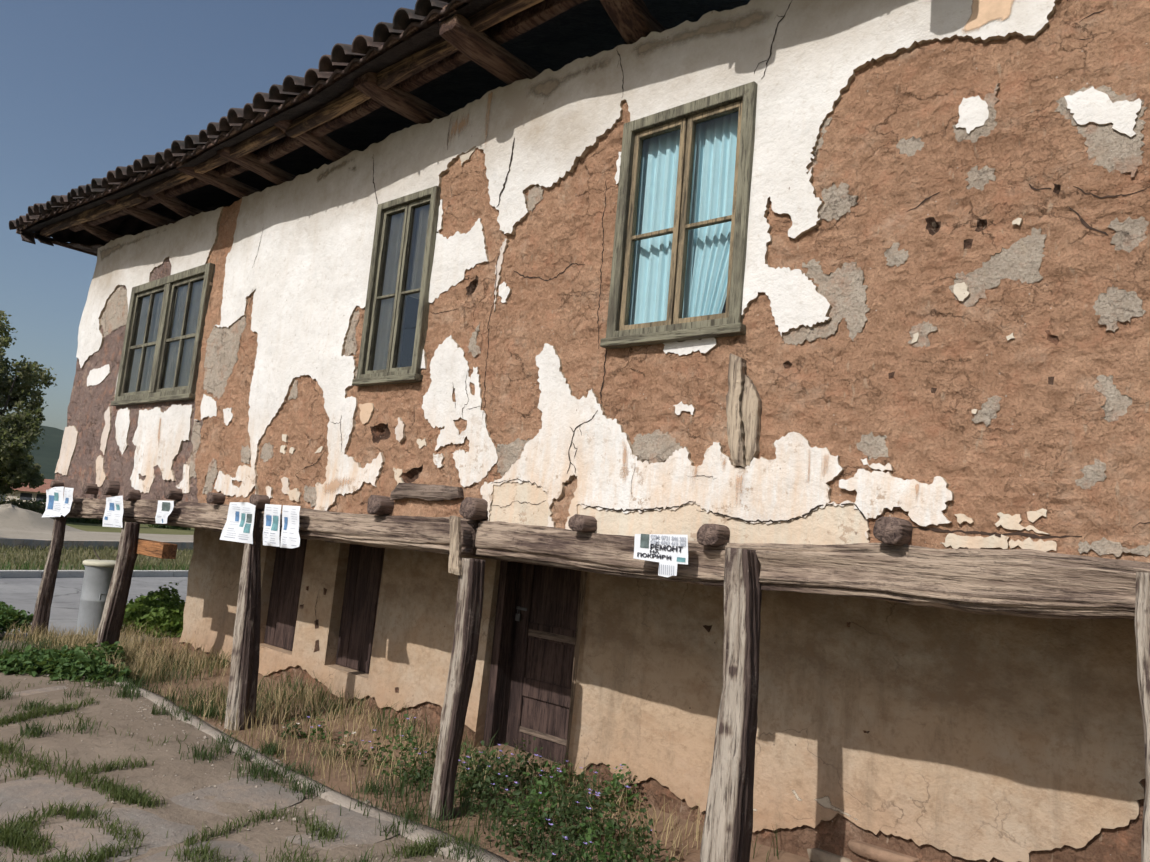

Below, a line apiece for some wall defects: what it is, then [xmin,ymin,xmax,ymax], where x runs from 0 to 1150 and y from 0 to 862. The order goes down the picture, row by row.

crack [754,1,792,79]
crack [497,138,515,206]
peeling [329,0,1150,563]
peeling [54,199,330,509]
flaking render [572,763,706,826]
flaking render [751,790,1003,862]
flaking render [1017,779,1146,862]